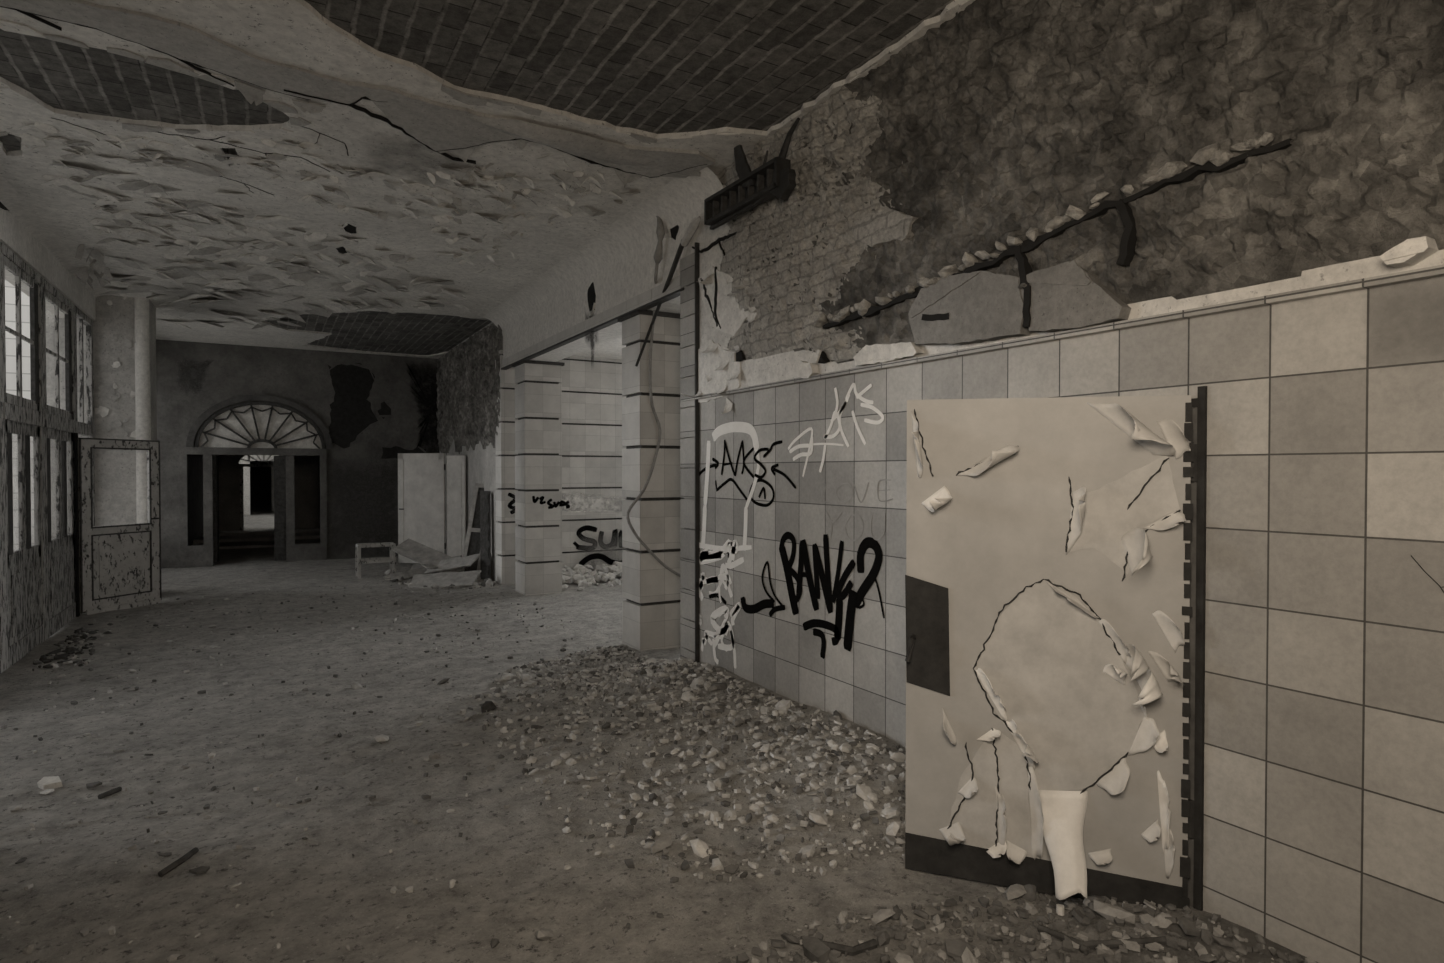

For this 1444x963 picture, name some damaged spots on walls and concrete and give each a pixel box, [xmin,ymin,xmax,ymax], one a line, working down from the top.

crack [0,6,707,195]
spalling [0,0,1444,459]
peeling [911,409,1019,512]
peeling [939,402,1194,916]